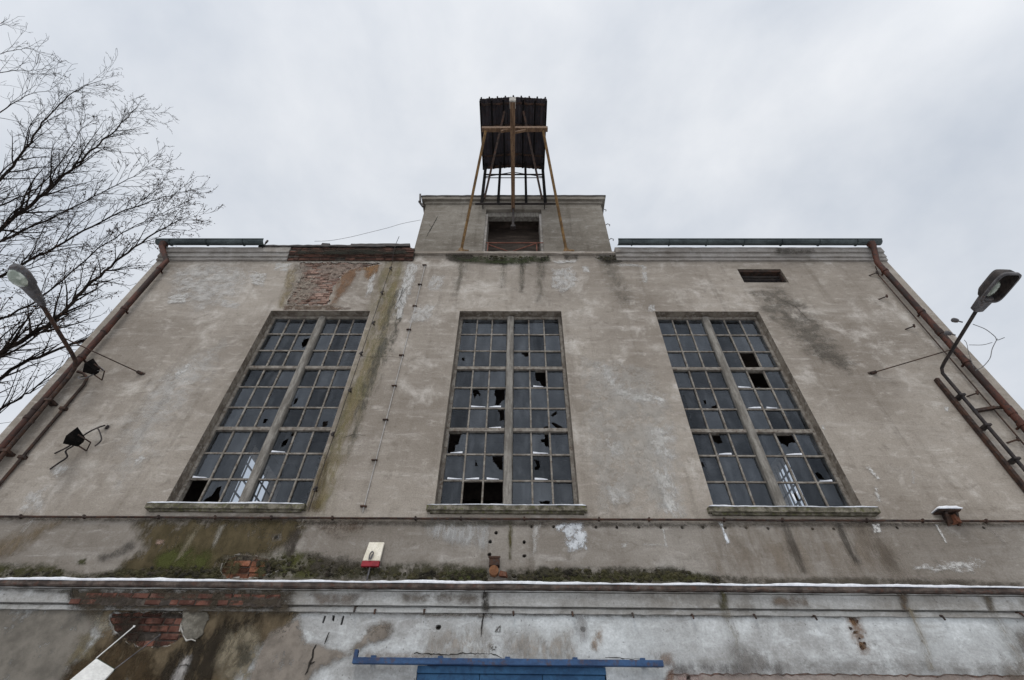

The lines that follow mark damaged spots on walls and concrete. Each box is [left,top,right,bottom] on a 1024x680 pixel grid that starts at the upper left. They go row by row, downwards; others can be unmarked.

spalling [287,261,380,306]
spalling [220,554,278,580]
water stain [0,519,390,680]
water stain [405,592,489,617]
spalling [109,611,183,647]
water stain [511,616,601,659]